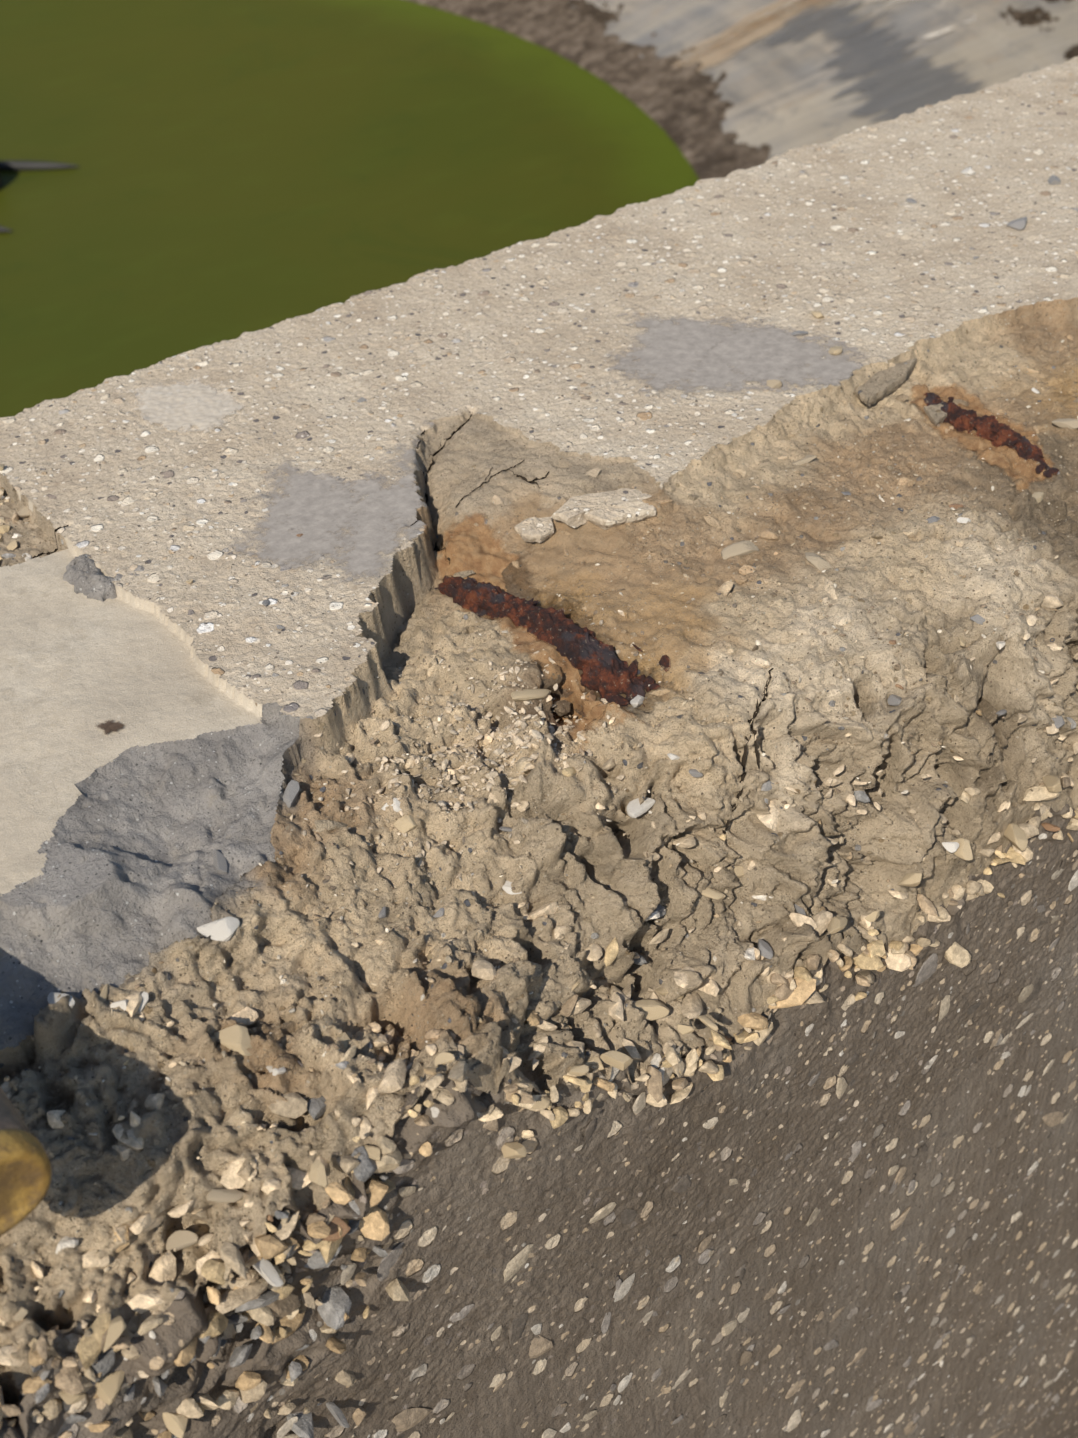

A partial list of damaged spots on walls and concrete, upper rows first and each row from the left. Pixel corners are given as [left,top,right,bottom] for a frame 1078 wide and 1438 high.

corrosion [911,383,1059,489]
corrosion [424,514,671,743]
spalling [0,297,1078,1438]